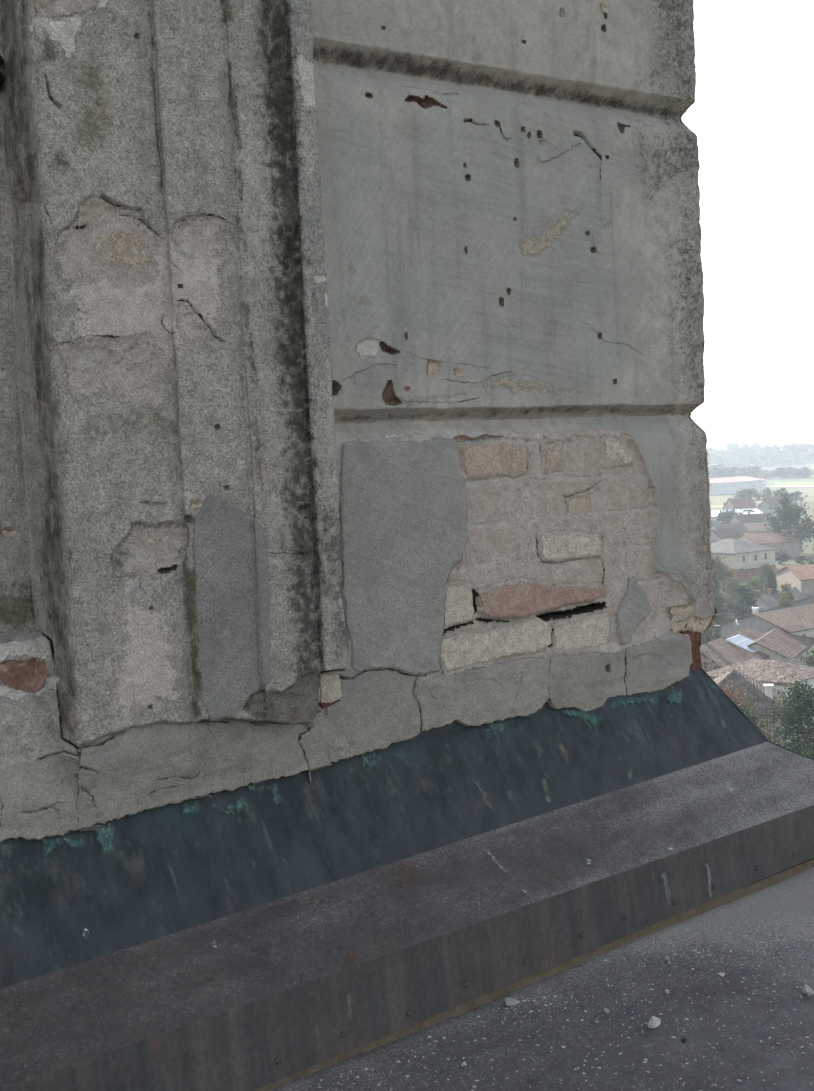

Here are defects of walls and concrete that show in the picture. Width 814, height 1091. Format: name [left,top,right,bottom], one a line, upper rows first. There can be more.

flaking render [29,0,108,58]
leakage [220,0,234,21]
leakage [226,58,243,153]
leakage [256,0,309,196]
crack [539,134,603,202]
flaking render [53,190,236,415]
leakage [272,216,319,440]
spalling [383,380,410,405]
spalling [438,430,717,676]
flaking render [0,635,62,702]
crack [340,668,443,732]
crack [146,758,206,800]